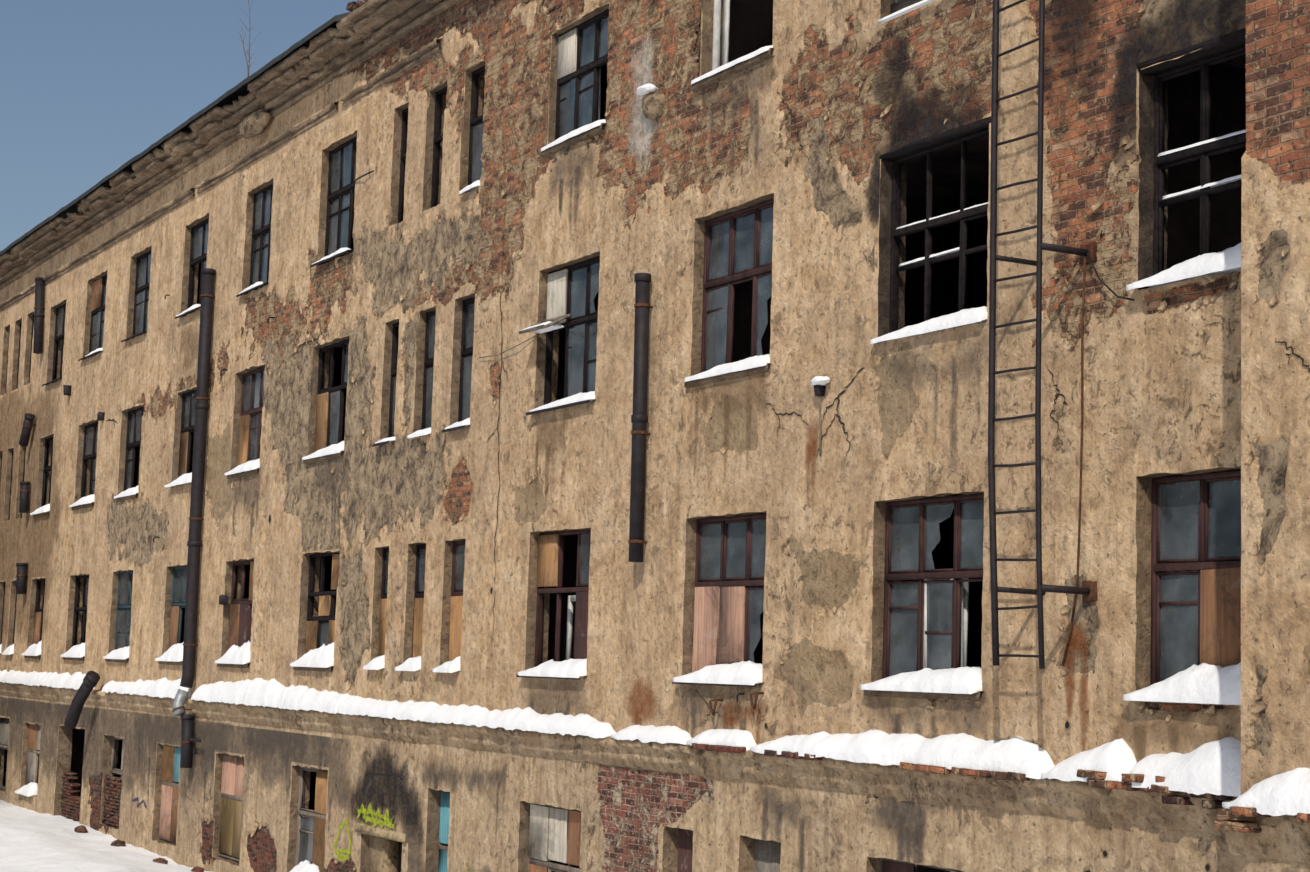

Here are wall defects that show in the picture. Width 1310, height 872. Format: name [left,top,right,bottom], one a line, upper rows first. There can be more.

flaking render [1193,0,1310,185]
flaking render [1029,0,1176,350]
flaking render [1144,272,1240,314]
flaking render [1254,229,1290,307]
flaking render [135,0,1002,690]
crack [1275,340,1310,371]
crack [765,367,864,462]
corrosion [1066,626,1086,746]
flaking render [691,743,746,753]
flaking render [764,750,824,760]
flaking render [247,820,277,872]
flaking render [594,765,714,872]